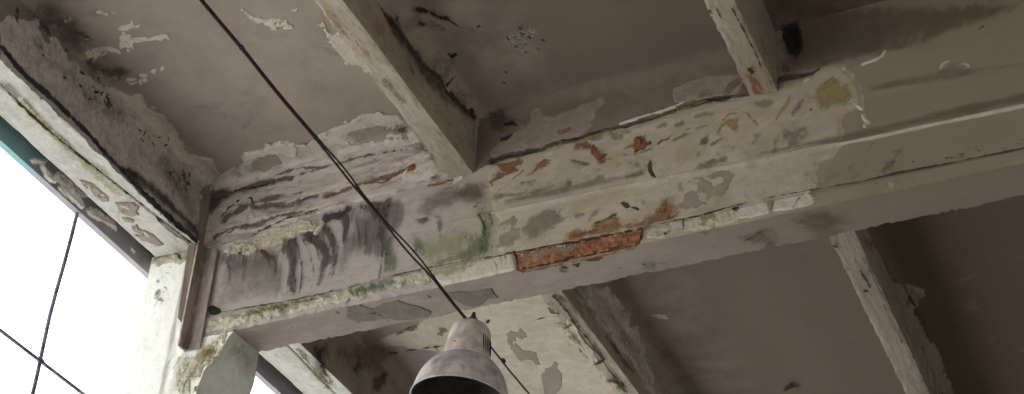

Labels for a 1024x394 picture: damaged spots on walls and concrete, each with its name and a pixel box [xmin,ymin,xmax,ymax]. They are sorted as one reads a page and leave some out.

damp [33,7,127,108]
damp [377,3,481,120]
damp [0,45,198,243]
peeling [0,8,464,267]
rust [489,158,551,190]
rust [574,142,607,164]
rust [624,128,690,177]
spalling [671,170,815,232]
damp [205,198,431,333]
spalling [496,215,644,273]
peeling [506,328,562,394]